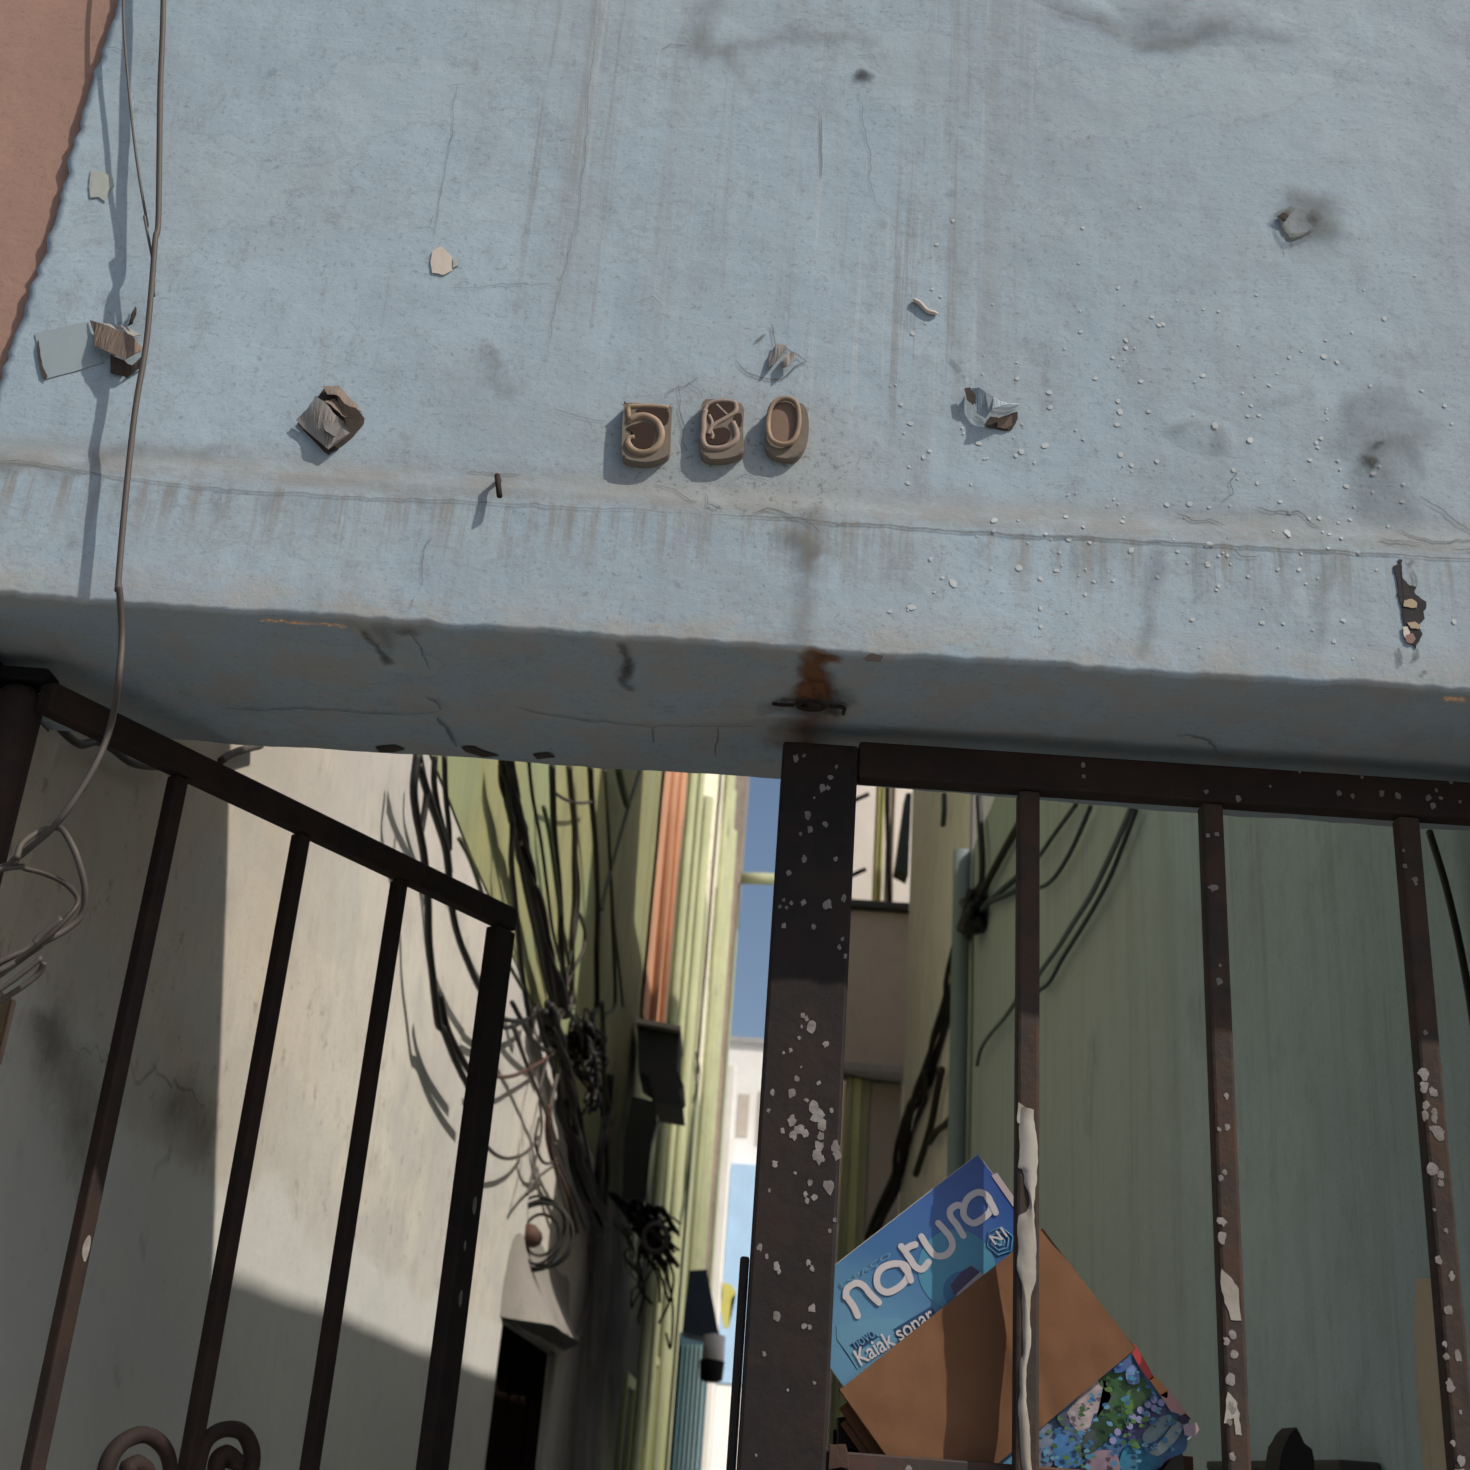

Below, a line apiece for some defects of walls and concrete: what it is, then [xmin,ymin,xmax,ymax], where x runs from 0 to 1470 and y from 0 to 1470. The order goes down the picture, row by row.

spalling [1275,207,1321,248]
peeling [1393,559,1426,674]
crack [230,634,457,747]
corrosion [795,649,839,743]